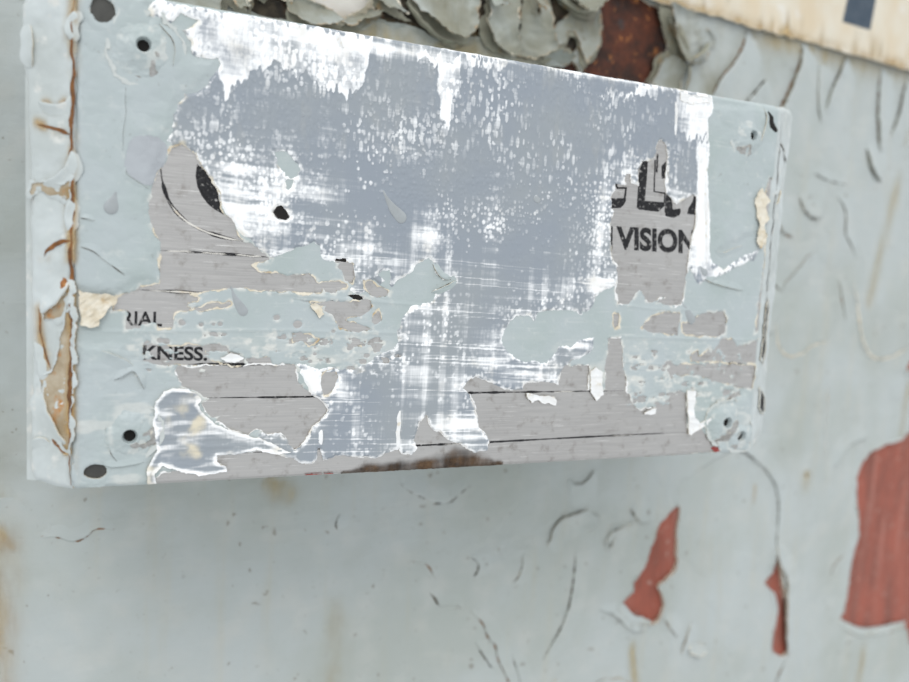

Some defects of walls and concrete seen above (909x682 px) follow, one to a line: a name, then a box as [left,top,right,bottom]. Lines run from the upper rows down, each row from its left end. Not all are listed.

peeling [169,0,716,90]
peeling [25,174,75,205]
crack [712,30,856,308]
crack [866,68,909,181]
peeling [112,139,772,482]
crack [429,552,520,682]
crack [543,553,588,661]
peeling [615,502,682,627]
peeling [764,548,790,662]
peeling [838,432,909,646]